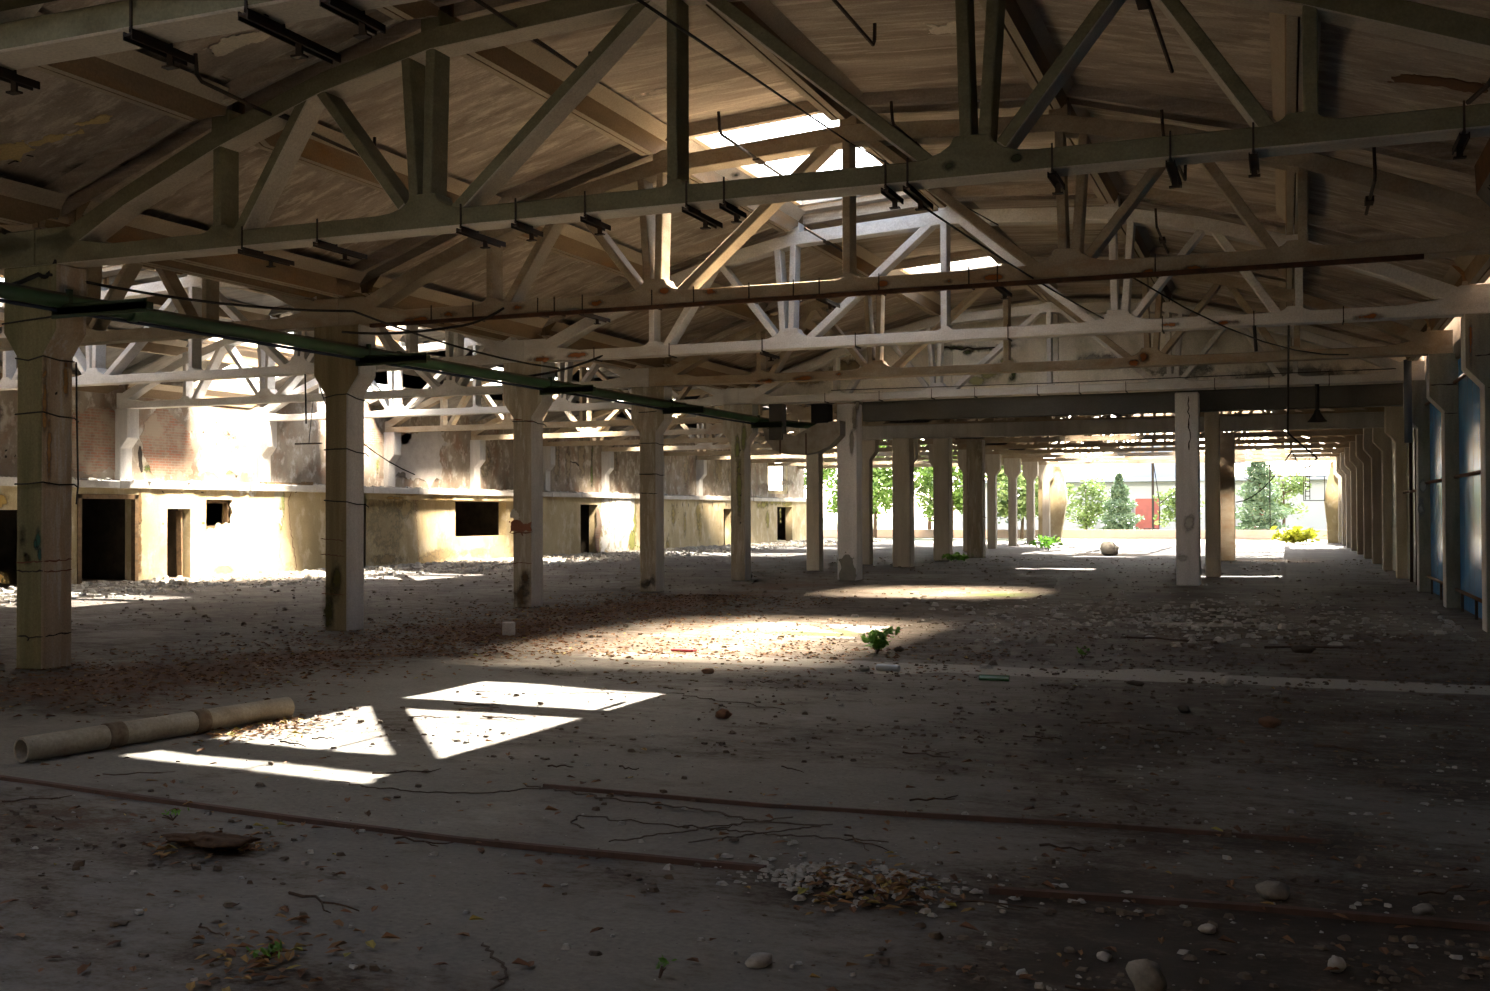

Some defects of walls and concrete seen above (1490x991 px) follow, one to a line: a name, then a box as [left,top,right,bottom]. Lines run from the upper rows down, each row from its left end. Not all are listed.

flaking render [140,408,296,575]
crack [330,781,889,843]